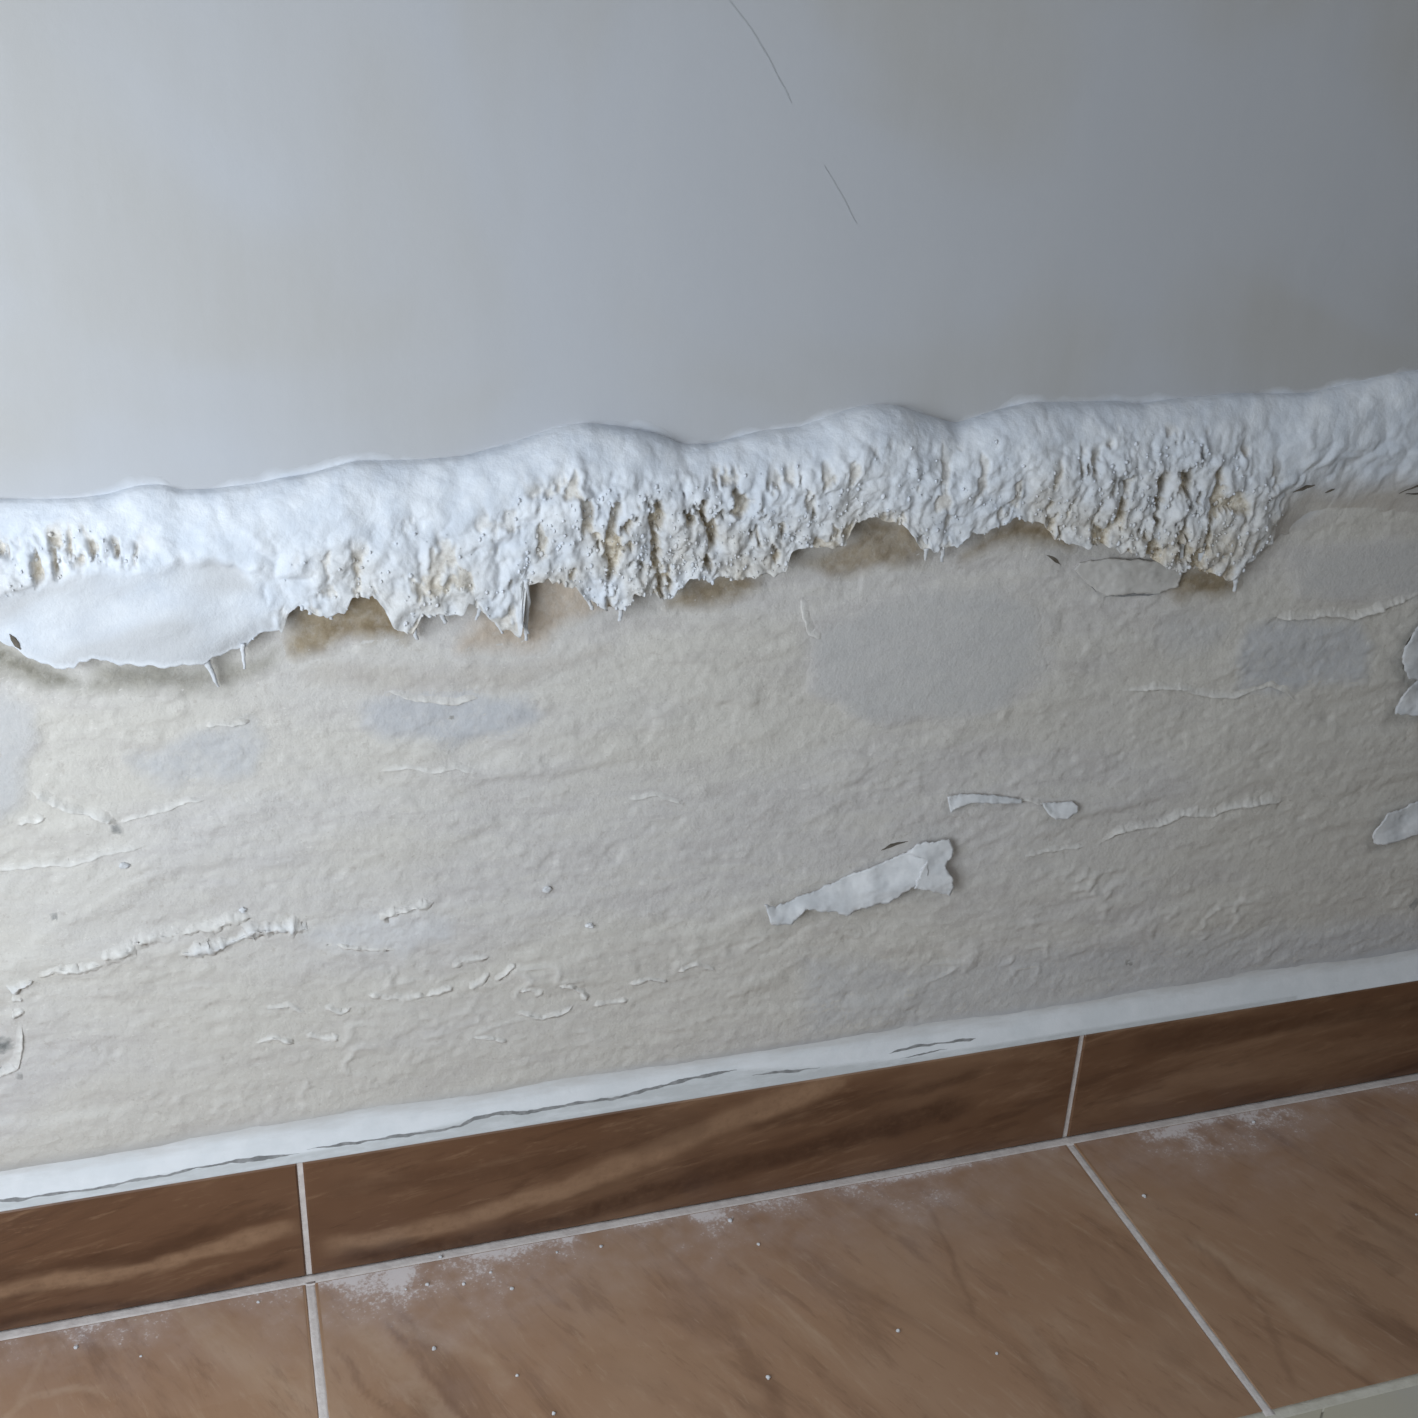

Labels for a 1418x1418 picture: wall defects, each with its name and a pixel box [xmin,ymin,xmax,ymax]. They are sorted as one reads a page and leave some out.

crack [729,0,791,101]
leakage [0,366,1418,702]
peeling [1272,592,1418,621]
peeling [1395,626,1418,716]
peeling [947,793,1078,820]
peeling [1372,801,1418,845]
peeling [764,839,954,925]